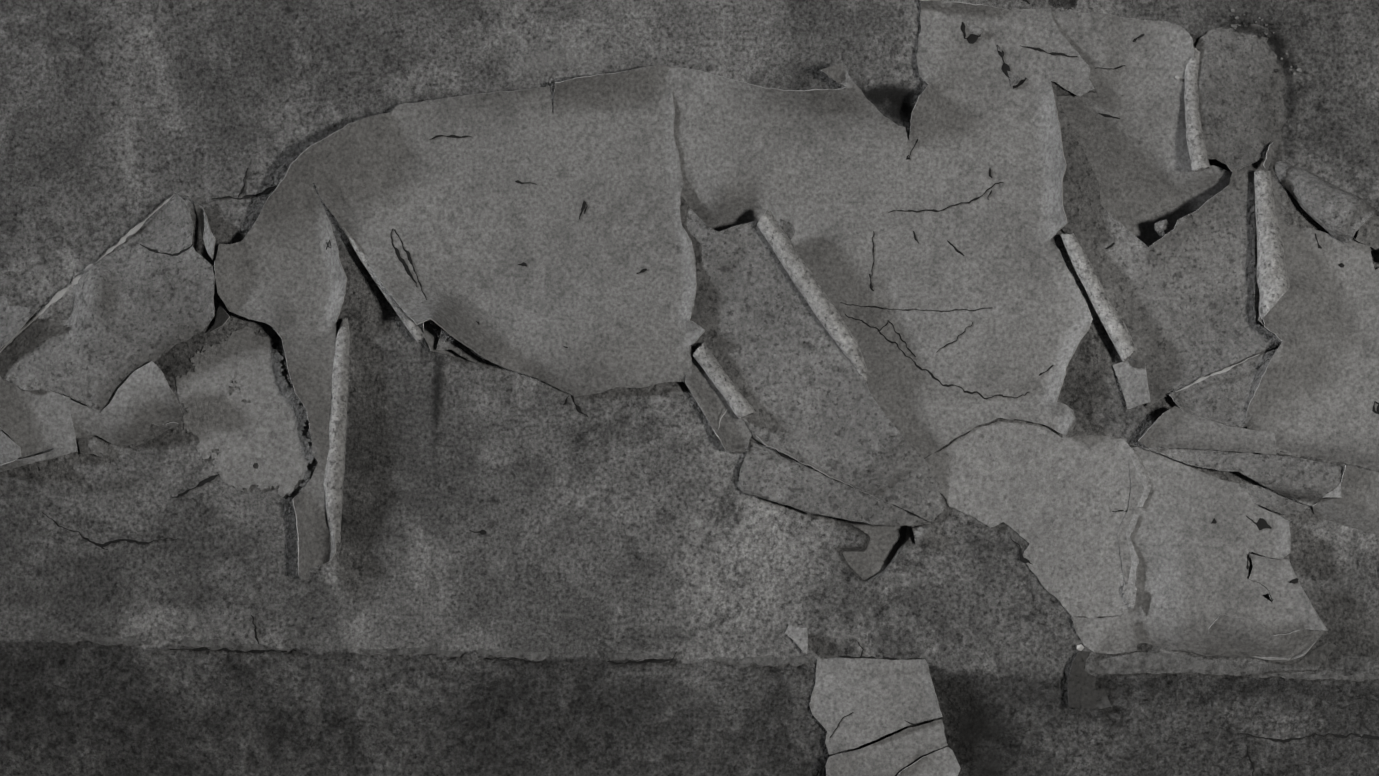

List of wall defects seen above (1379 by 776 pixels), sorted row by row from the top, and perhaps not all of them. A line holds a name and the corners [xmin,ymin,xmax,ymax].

peeling [0,0,1289,581]
peeling [1052,86,1379,662]
peeling [785,623,961,776]
peeling [1068,642,1337,710]